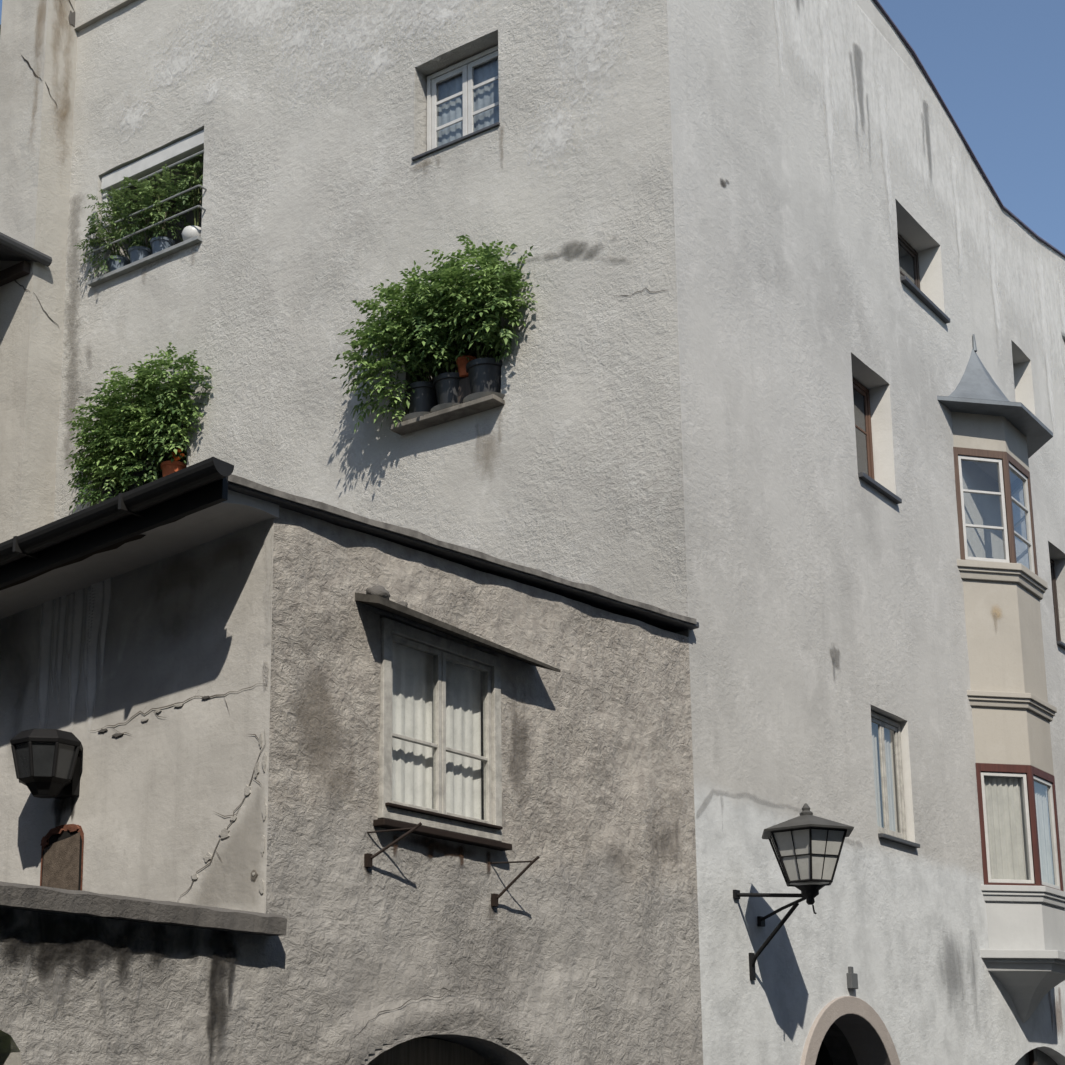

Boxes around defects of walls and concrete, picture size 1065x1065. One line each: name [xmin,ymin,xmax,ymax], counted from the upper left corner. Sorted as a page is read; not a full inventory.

crack [21,55,57,106]
crack [14,280,59,327]
crack [92,683,264,738]
crack [177,729,265,902]
leakage [0,913,138,1010]
leakage [208,930,236,1059]